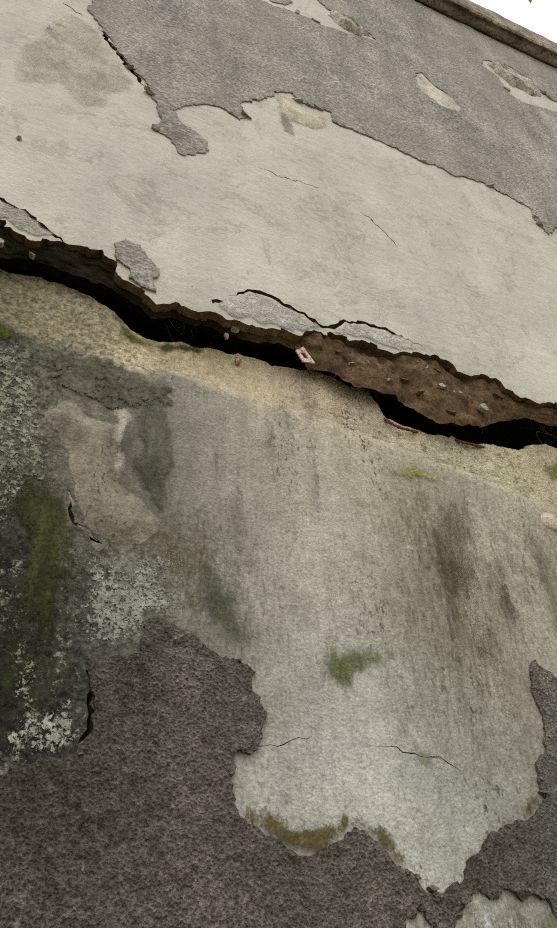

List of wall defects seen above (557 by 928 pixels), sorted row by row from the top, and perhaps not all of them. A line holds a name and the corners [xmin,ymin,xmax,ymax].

flaking render [21,0,557,235]
crack [0,197,65,246]
spalling [0,226,557,427]
crack [211,289,422,346]
crack [68,490,102,544]
flaking render [0,617,557,928]